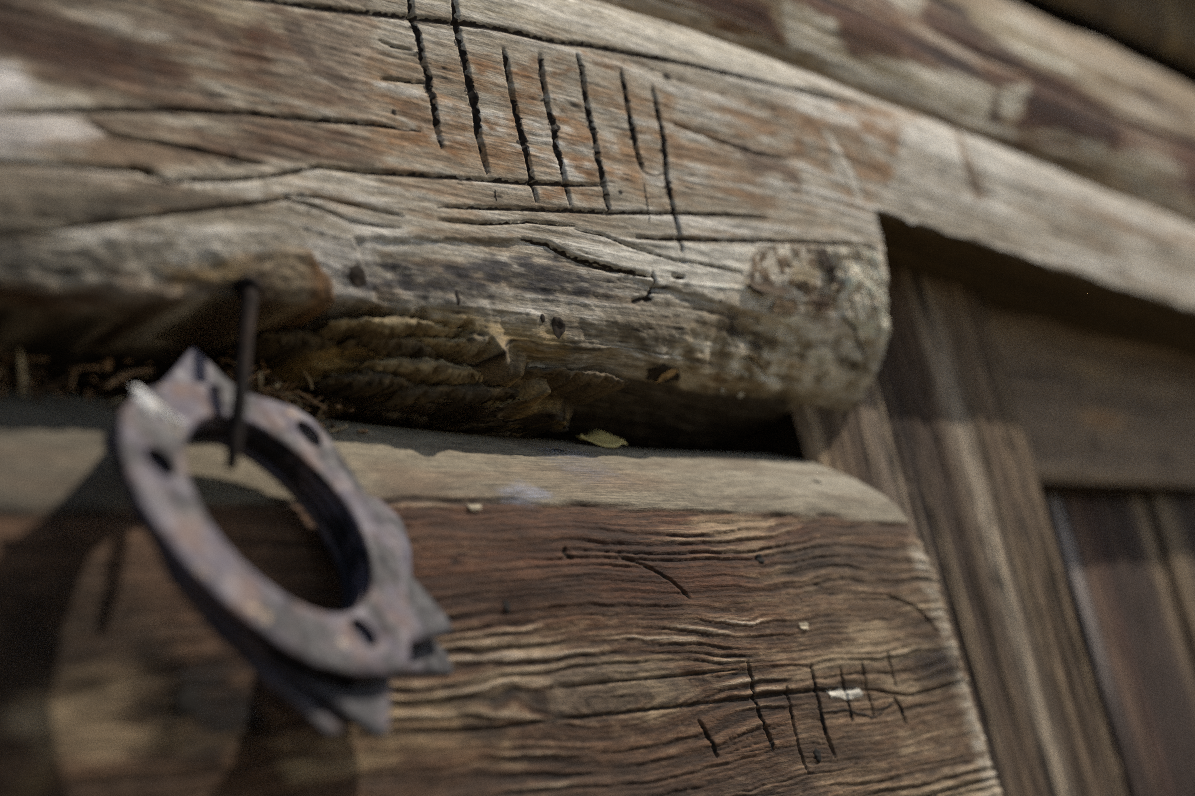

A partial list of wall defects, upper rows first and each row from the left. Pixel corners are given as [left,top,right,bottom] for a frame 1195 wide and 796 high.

crack [0,107,874,304]
crack [618,554,691,599]